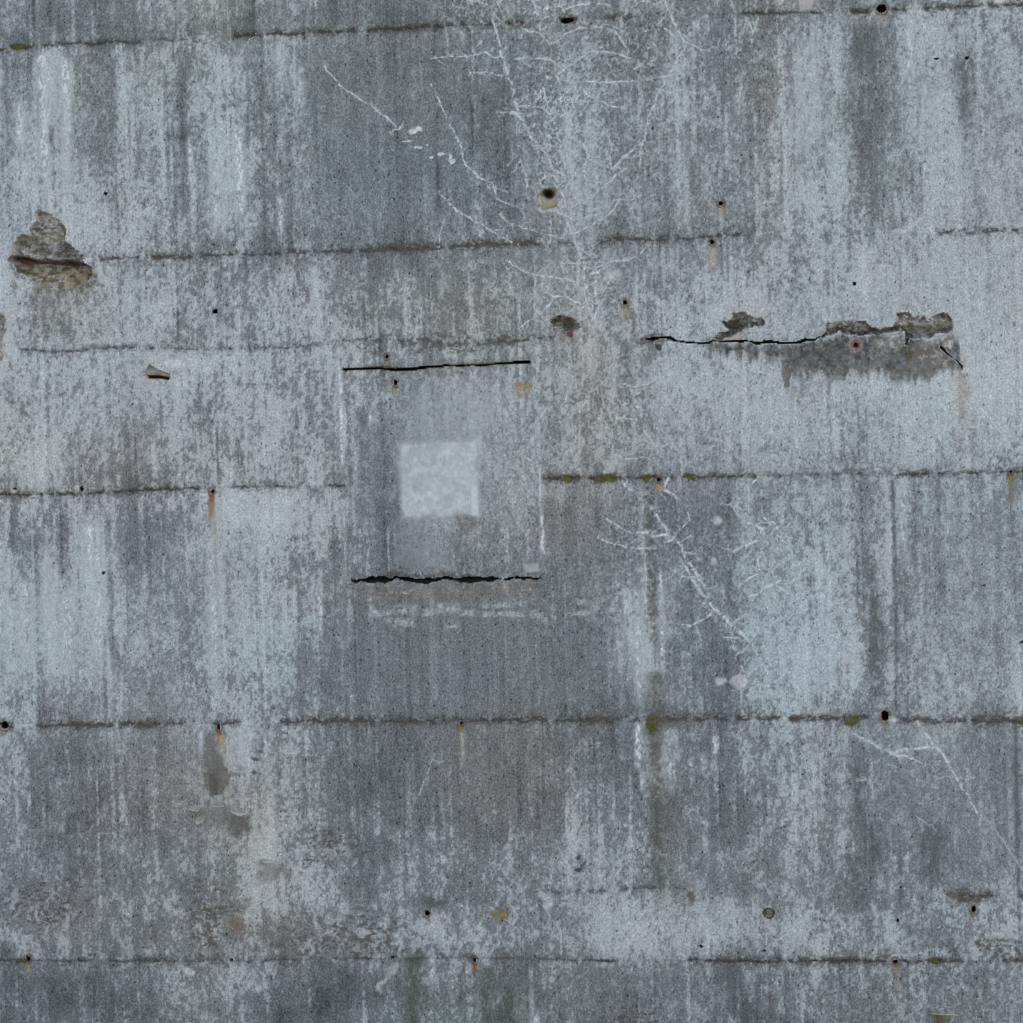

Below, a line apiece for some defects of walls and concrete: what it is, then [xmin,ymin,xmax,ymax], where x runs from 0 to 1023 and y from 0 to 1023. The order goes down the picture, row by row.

spalling [7,209,97,297]
crack [636,331,827,351]
spalling [709,311,960,387]
spalling [143,364,172,381]
crack [351,571,542,599]